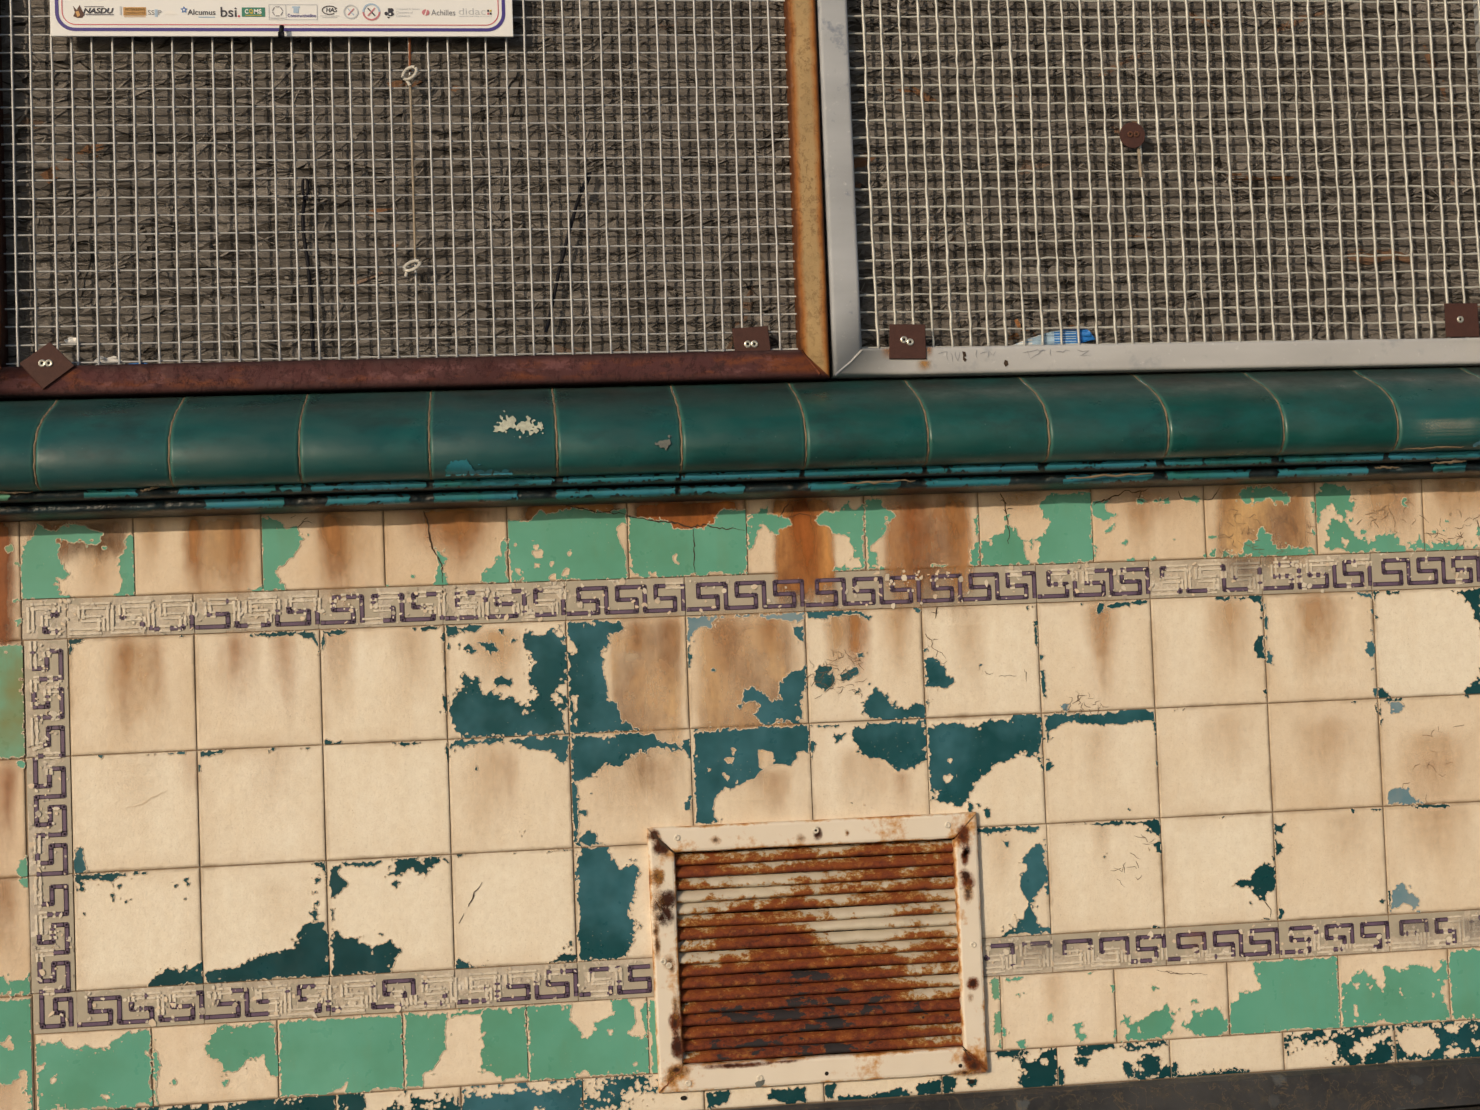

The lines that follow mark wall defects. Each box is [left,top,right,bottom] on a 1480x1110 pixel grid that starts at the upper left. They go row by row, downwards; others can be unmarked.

corrosion [408,37,416,258]
peeling [493,410,544,438]
corrosion [0,522,13,646]
crack [423,511,443,582]
corrosion [773,498,835,602]
corrosion [887,500,969,597]
peeling [0,441,1480,1110]
corrosion [647,830,675,971]
corrosion [957,825,974,901]
corrosion [667,999,690,1084]
corrosion [708,1060,796,1068]
corrosion [955,1052,984,1075]